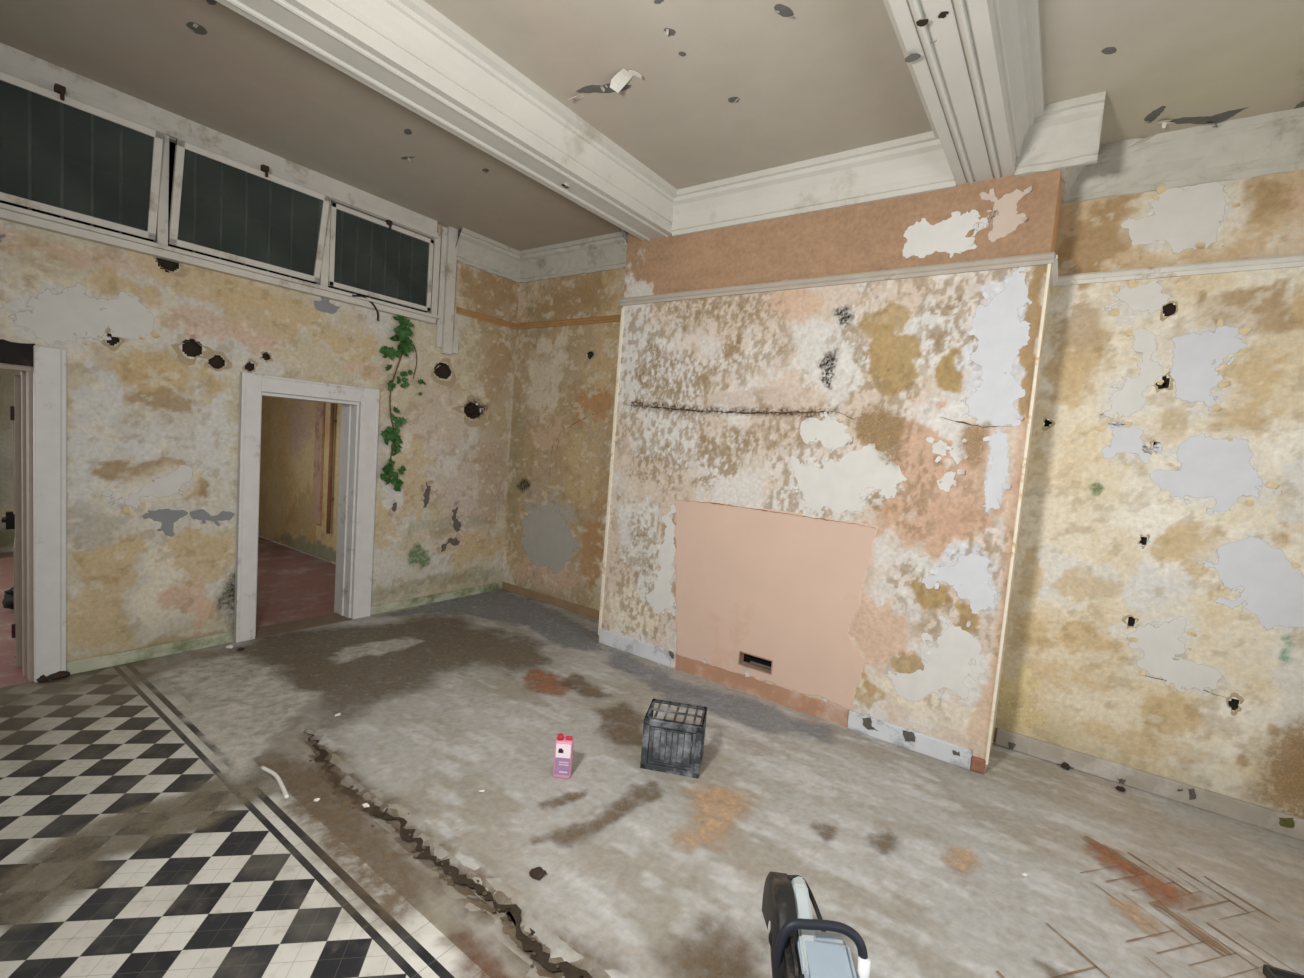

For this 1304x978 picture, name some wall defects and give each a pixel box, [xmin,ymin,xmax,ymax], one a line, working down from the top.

peeling [568,68,642,100]
peeling [1144,106,1248,128]
peeling [902,186,1032,258]
peeling [1120,182,1239,253]
peeling [1104,279,1178,321]
crack [548,405,858,486]
peeling [925,437,969,492]
crack [941,417,1013,428]
peeling [961,267,1032,512]
peeling [1097,422,1282,515]
peeling [1154,319,1252,411]
crack [304,729,593,978]